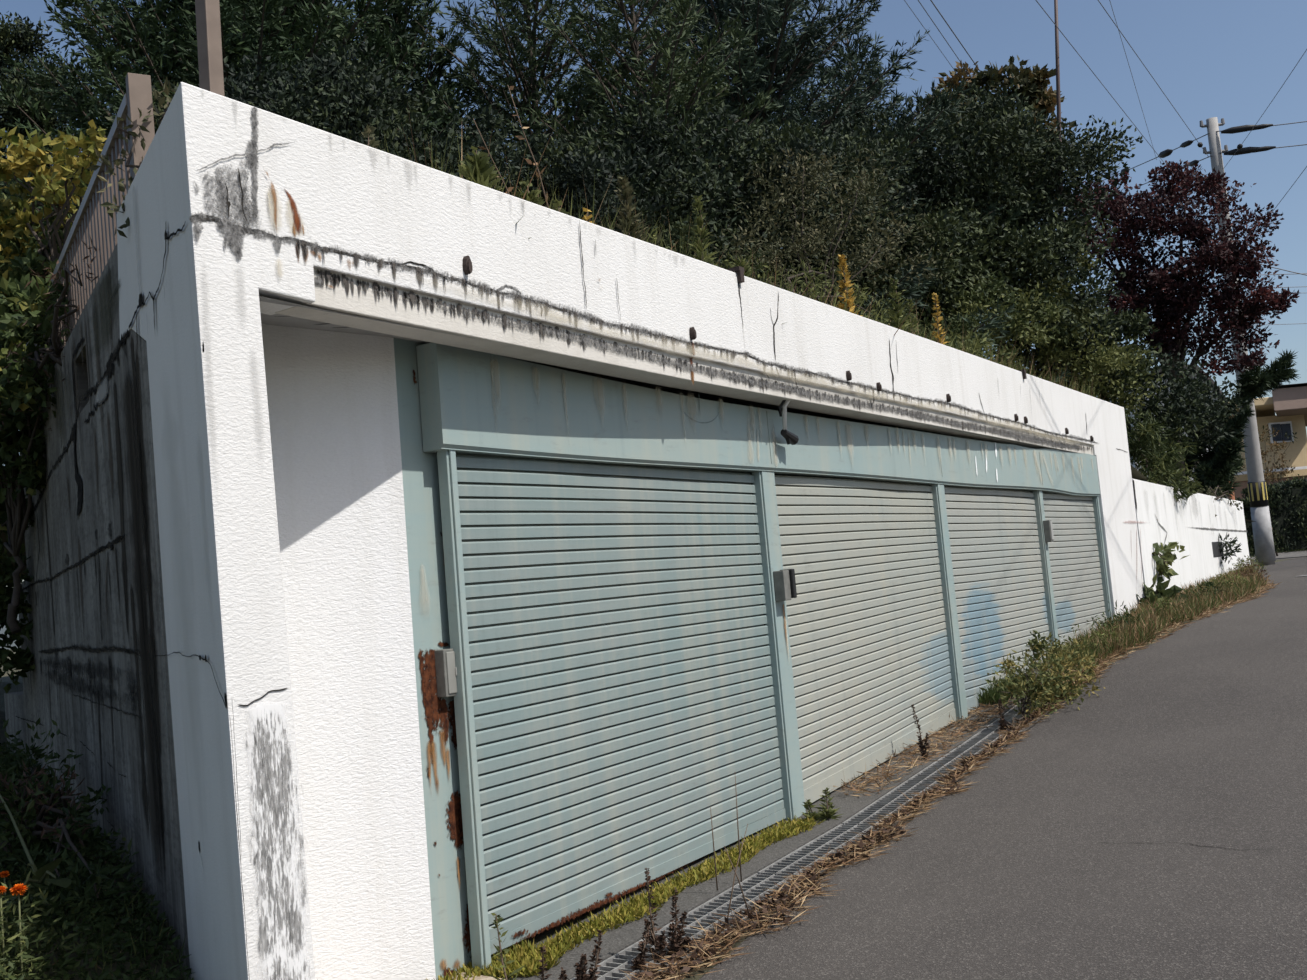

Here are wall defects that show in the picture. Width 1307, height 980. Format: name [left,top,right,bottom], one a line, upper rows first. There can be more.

damp [194,107,259,260]
rust [266,172,321,261]
crack [33,143,1167,544]
damp [274,238,1092,482]
damp [17,268,165,867]
crack [154,652,287,980]
rust [418,641,457,787]
rust [434,791,464,884]